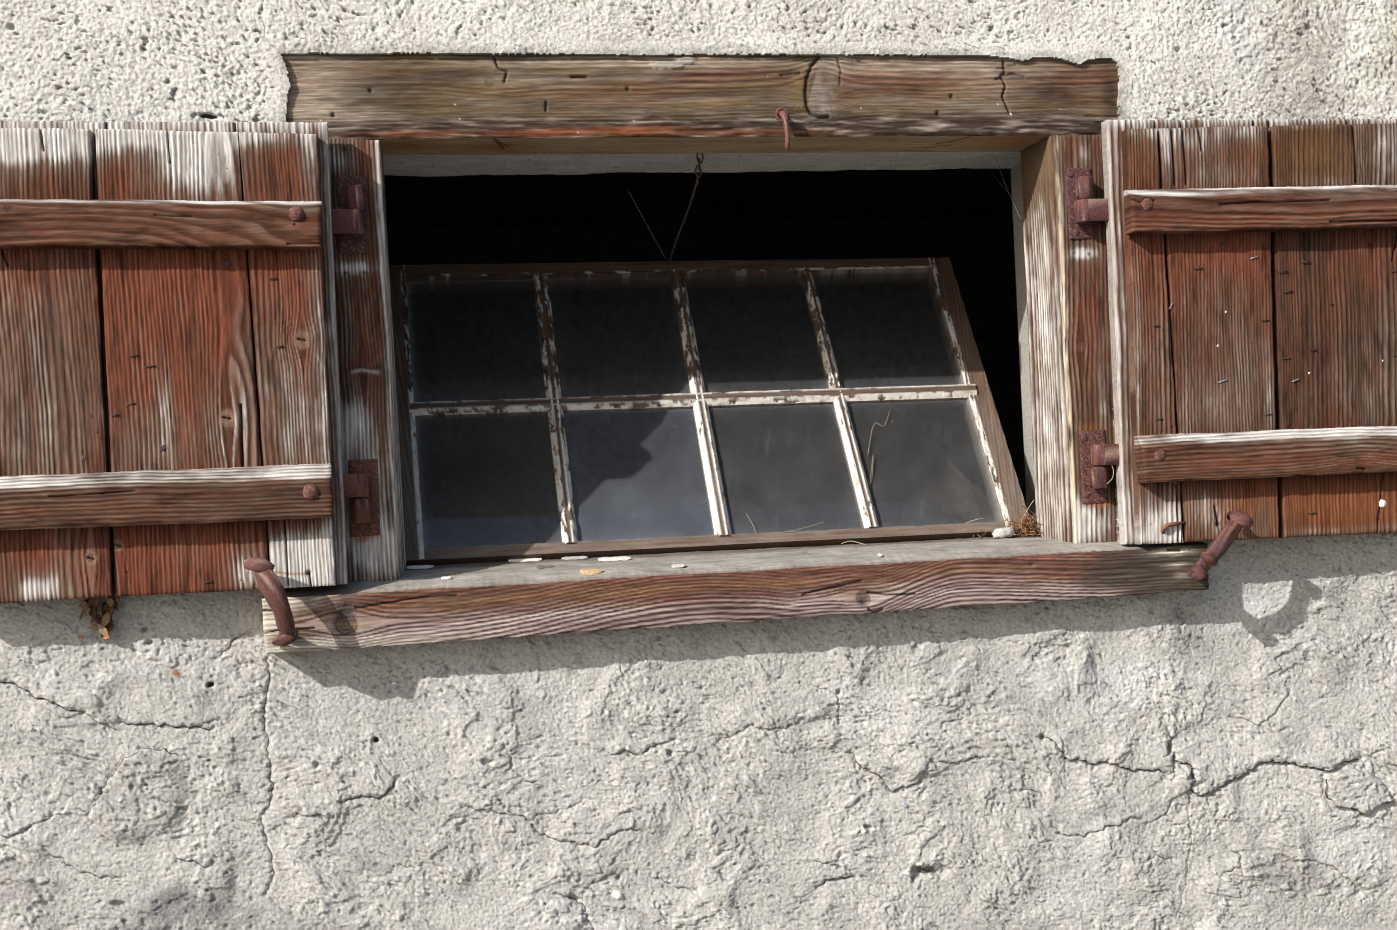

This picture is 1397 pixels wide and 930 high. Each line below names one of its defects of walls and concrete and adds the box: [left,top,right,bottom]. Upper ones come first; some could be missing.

crack [0,682,213,810]
crack [815,686,983,792]
crack [1,816,120,878]
crack [465,742,694,930]
crack [1036,728,1358,921]